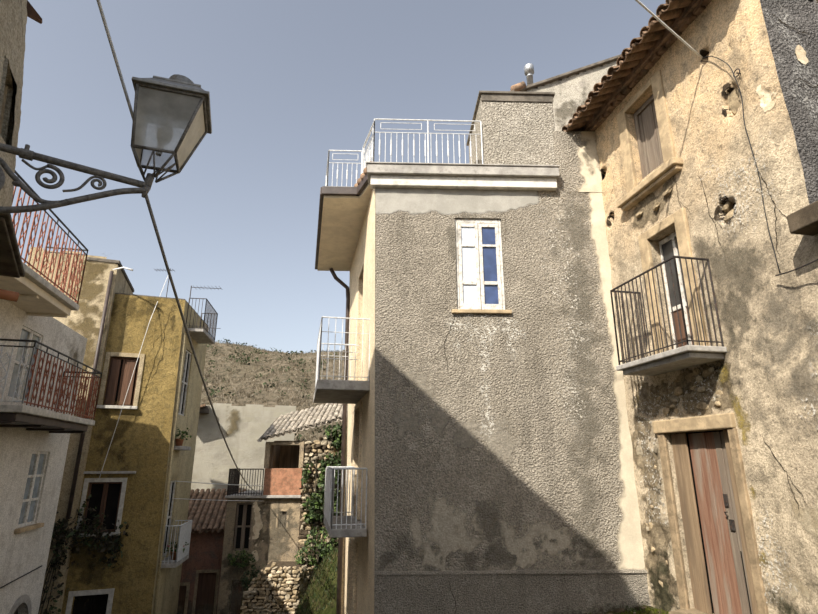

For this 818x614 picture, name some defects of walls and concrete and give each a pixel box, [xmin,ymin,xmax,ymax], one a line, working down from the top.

hole [721,83,741,117]
peeling [763,5,818,120]
crack [675,171,724,251]
hole [714,194,736,224]
flaking render [631,360,737,608]
crack [762,436,805,509]